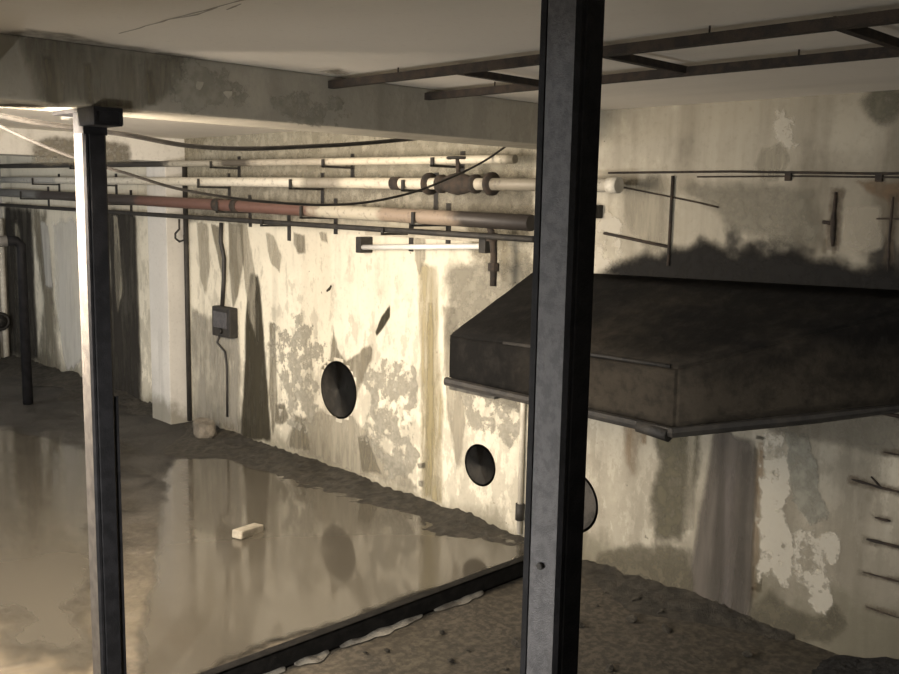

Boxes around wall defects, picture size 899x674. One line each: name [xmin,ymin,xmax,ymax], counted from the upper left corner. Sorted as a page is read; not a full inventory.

damp [10,32,188,111]
crack [119,0,244,34]
damp [864,90,899,123]
damp [108,214,141,399]
peeling [268,314,324,432]
peeling [360,358,425,479]
damp [596,432,844,640]
peeling [756,431,840,614]